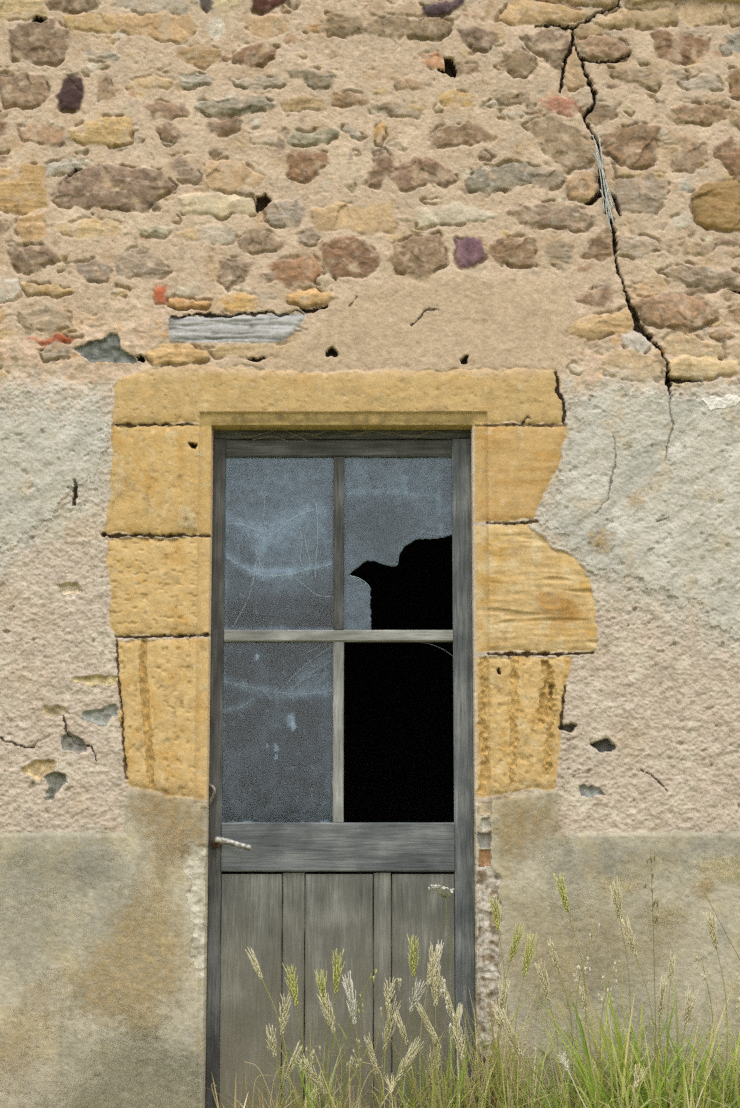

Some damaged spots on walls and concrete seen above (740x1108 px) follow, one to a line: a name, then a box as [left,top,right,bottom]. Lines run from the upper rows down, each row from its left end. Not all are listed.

crack [536,0,703,395]
crack [554,372,566,424]
flaking render [57,582,82,595]
flaking render [71,674,118,687]
flaking render [42,703,118,726]
spalling [507,656,520,786]
spalling [536,659,577,776]
flaking render [60,731,87,754]
flaking render [590,739,616,752]
flaking render [20,759,68,799]
flaking render [580,785,604,798]
peeling [475,656,504,1105]